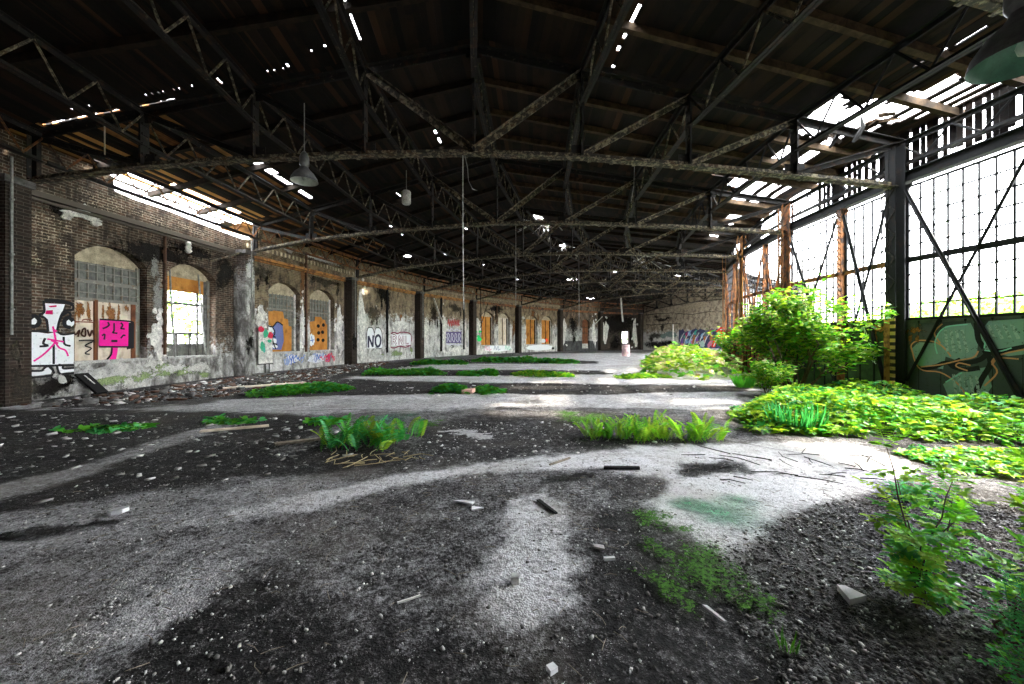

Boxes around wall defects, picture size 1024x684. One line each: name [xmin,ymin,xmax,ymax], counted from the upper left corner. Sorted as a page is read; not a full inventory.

peeling [255,305,268,328]
water stain [368,288,391,326]